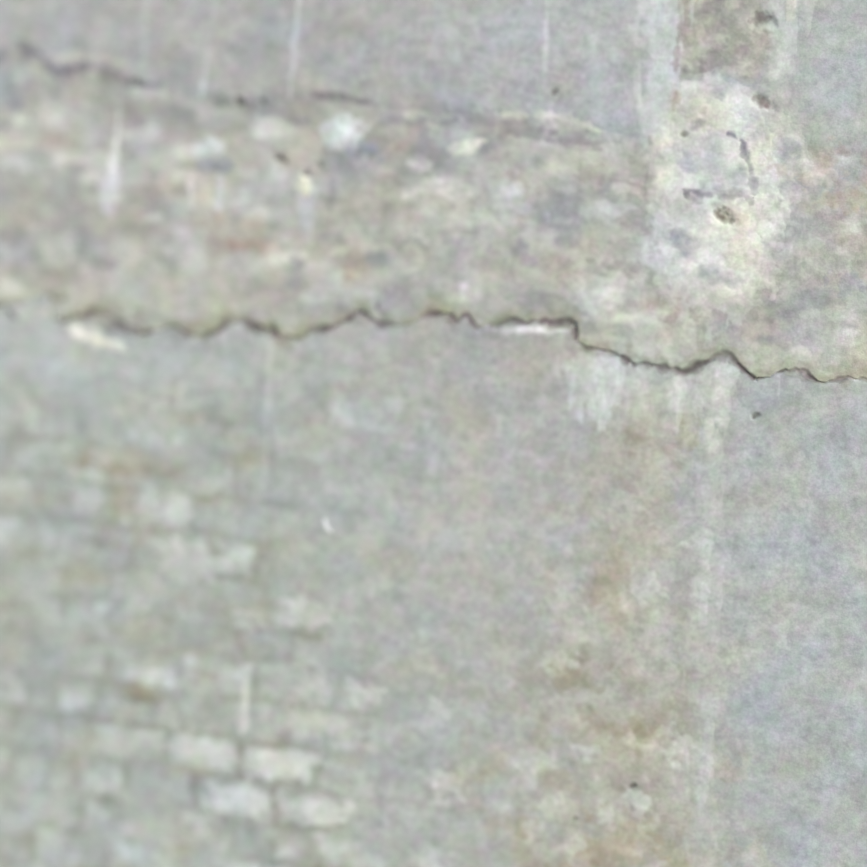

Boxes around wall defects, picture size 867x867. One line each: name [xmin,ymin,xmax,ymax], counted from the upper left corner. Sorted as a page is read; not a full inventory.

crack [0,279,867,389]